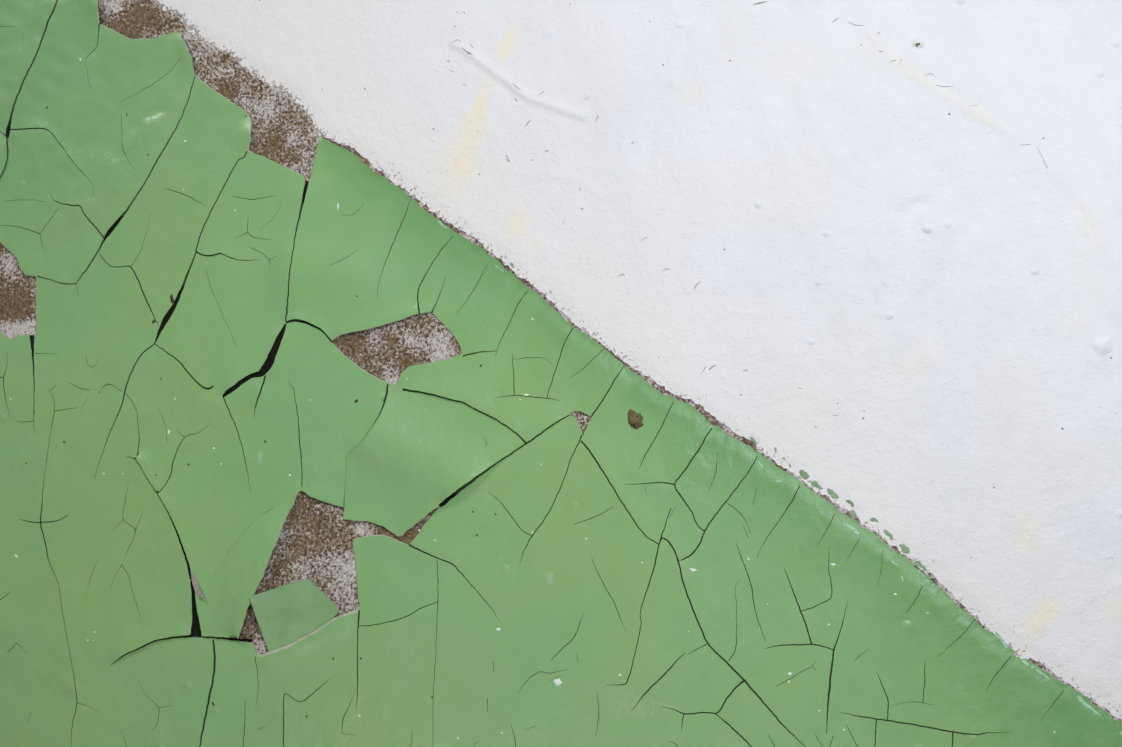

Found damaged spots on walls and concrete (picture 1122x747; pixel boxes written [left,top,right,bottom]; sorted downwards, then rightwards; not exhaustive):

crack [0,0,334,747]
crack [377,197,412,297]
crack [417,237,486,315]
peeling [0,0,1012,655]
crack [372,291,1004,747]
crack [342,601,438,734]
spalling [1028,658,1122,723]